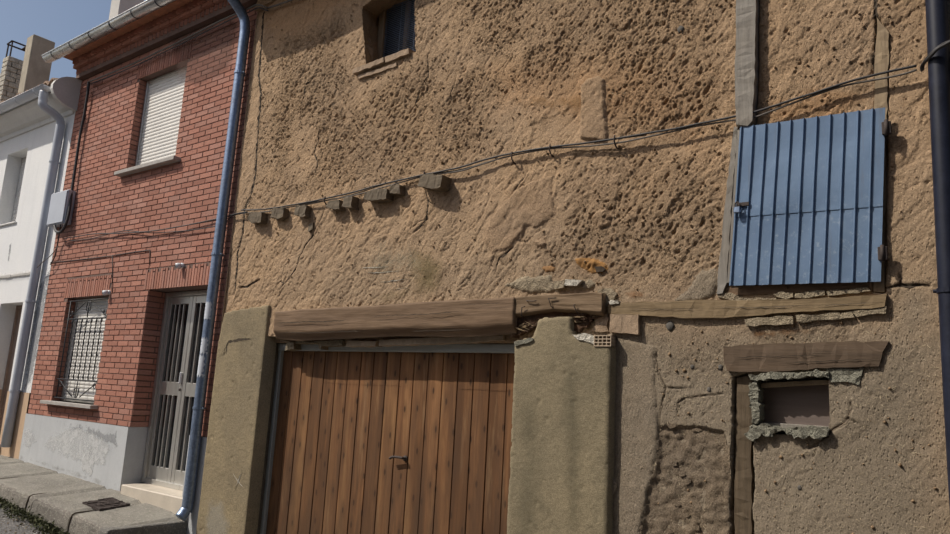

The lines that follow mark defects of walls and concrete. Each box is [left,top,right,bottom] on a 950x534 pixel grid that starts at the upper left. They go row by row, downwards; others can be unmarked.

crack [871,0,879,68]
crack [235,11,325,289]
peeling [505,258,608,294]
spalling [573,333,594,344]
crack [655,355,721,425]
spalling [639,423,734,534]